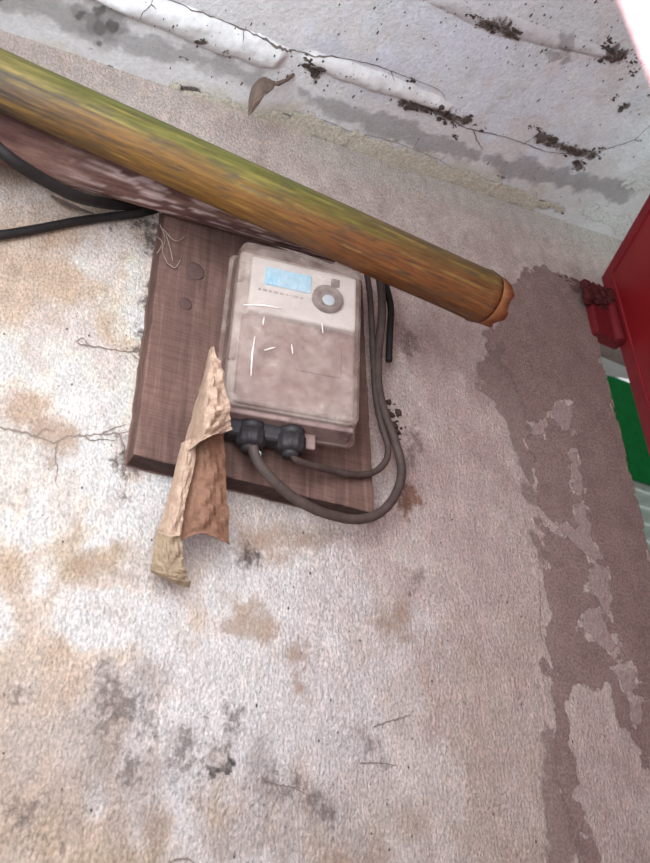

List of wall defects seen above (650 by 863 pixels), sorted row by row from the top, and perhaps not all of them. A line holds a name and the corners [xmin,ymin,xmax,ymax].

water stain [93,6,119,46]
crack [140,0,566,154]
crack [0,424,128,481]
peeling [555,452,610,614]